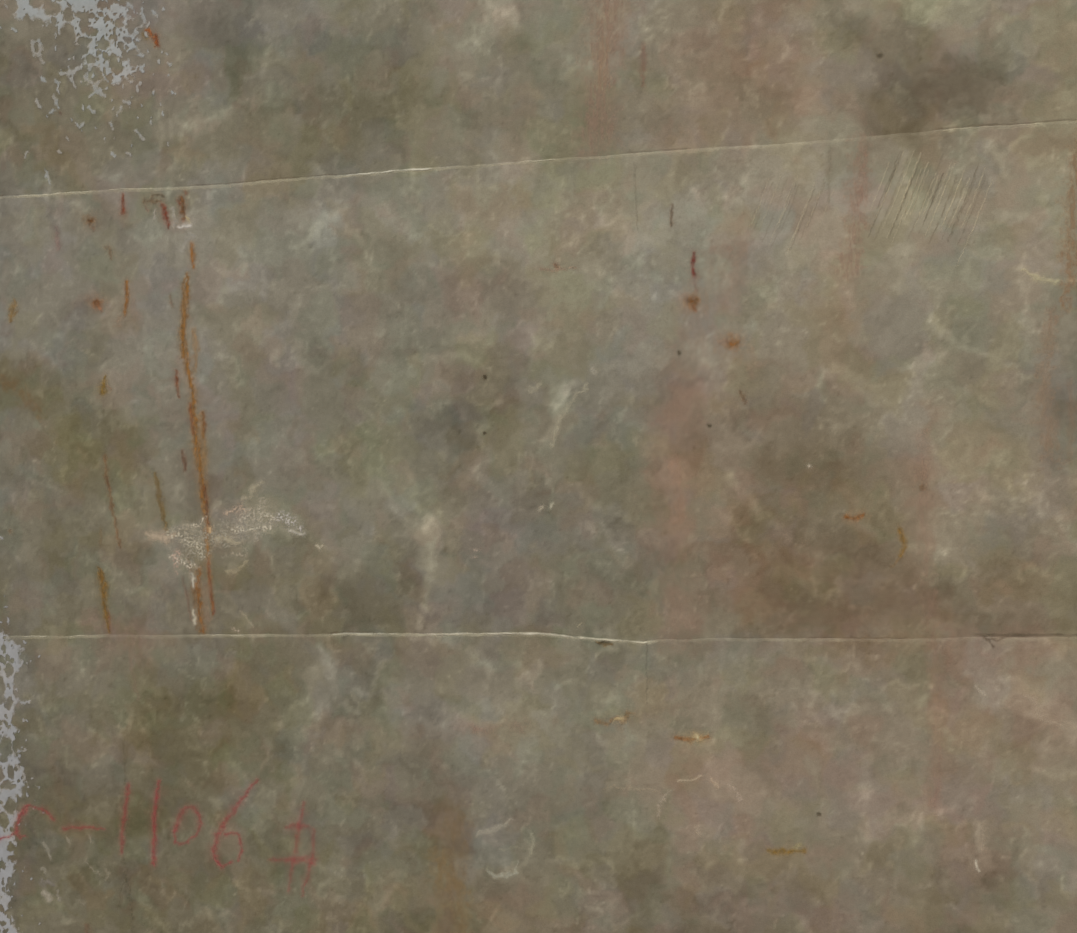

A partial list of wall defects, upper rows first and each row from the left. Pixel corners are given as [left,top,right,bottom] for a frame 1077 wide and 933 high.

peeling [15,0,150,93]
rust [176,244,214,634]
water stain [152,487,301,587]
peeling [0,619,40,741]
peeling [0,754,32,933]